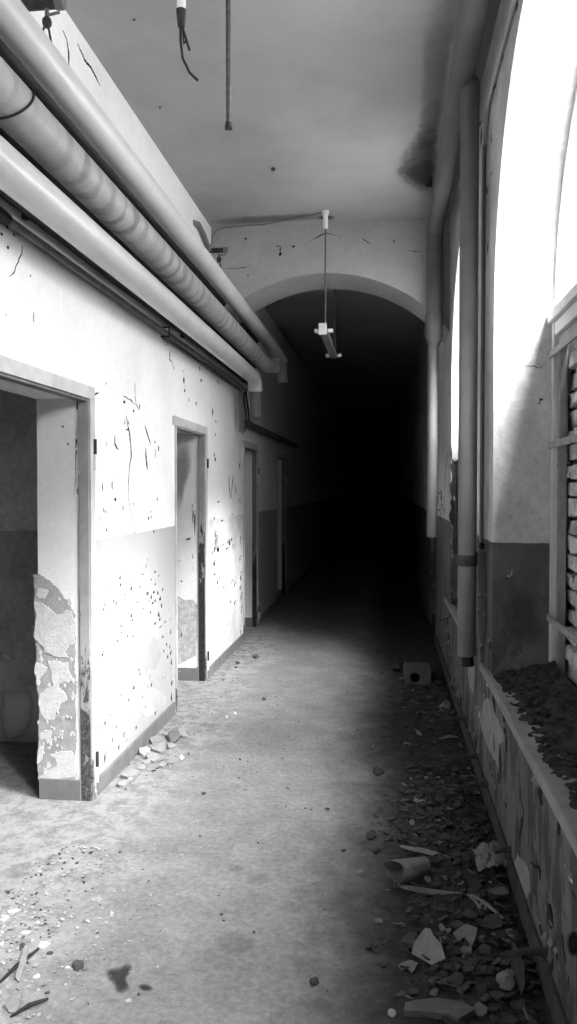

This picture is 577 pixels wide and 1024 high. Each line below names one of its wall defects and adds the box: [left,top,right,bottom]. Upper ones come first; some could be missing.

crack [63,31,100,85]
leakage [401,140,434,185]
crack [106,396,156,524]
peeling [33,574,79,780]
peeling [97,558,198,763]
flaking render [514,853,559,962]